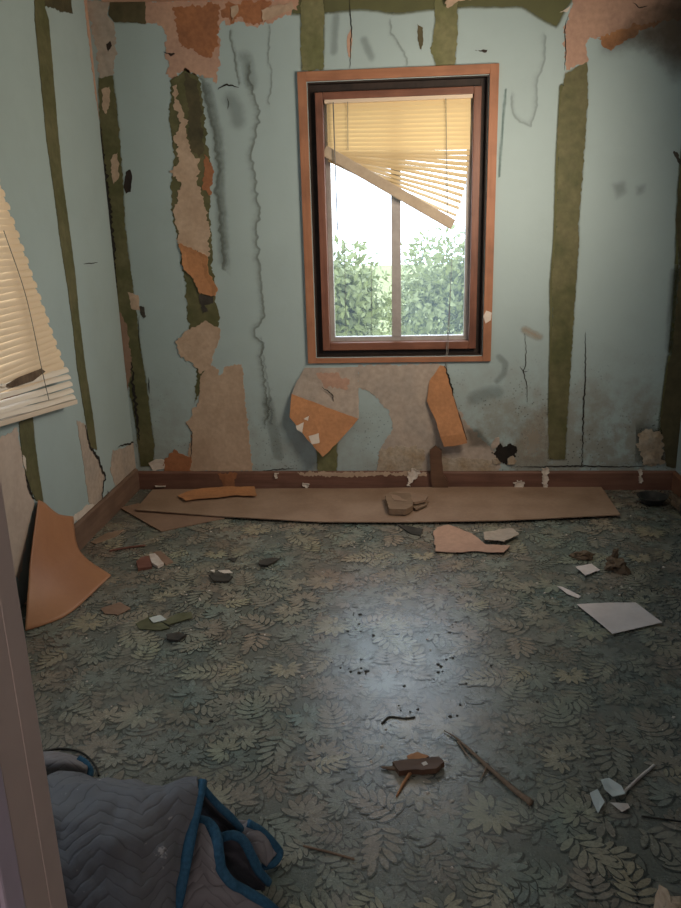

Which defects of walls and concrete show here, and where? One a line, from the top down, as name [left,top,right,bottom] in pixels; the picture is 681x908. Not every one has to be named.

peeling [561,0,677,74]
peeling [145,0,299,471]
peeling [73,421,136,522]
peeling [296,362,517,488]
crack [517,332,641,468]